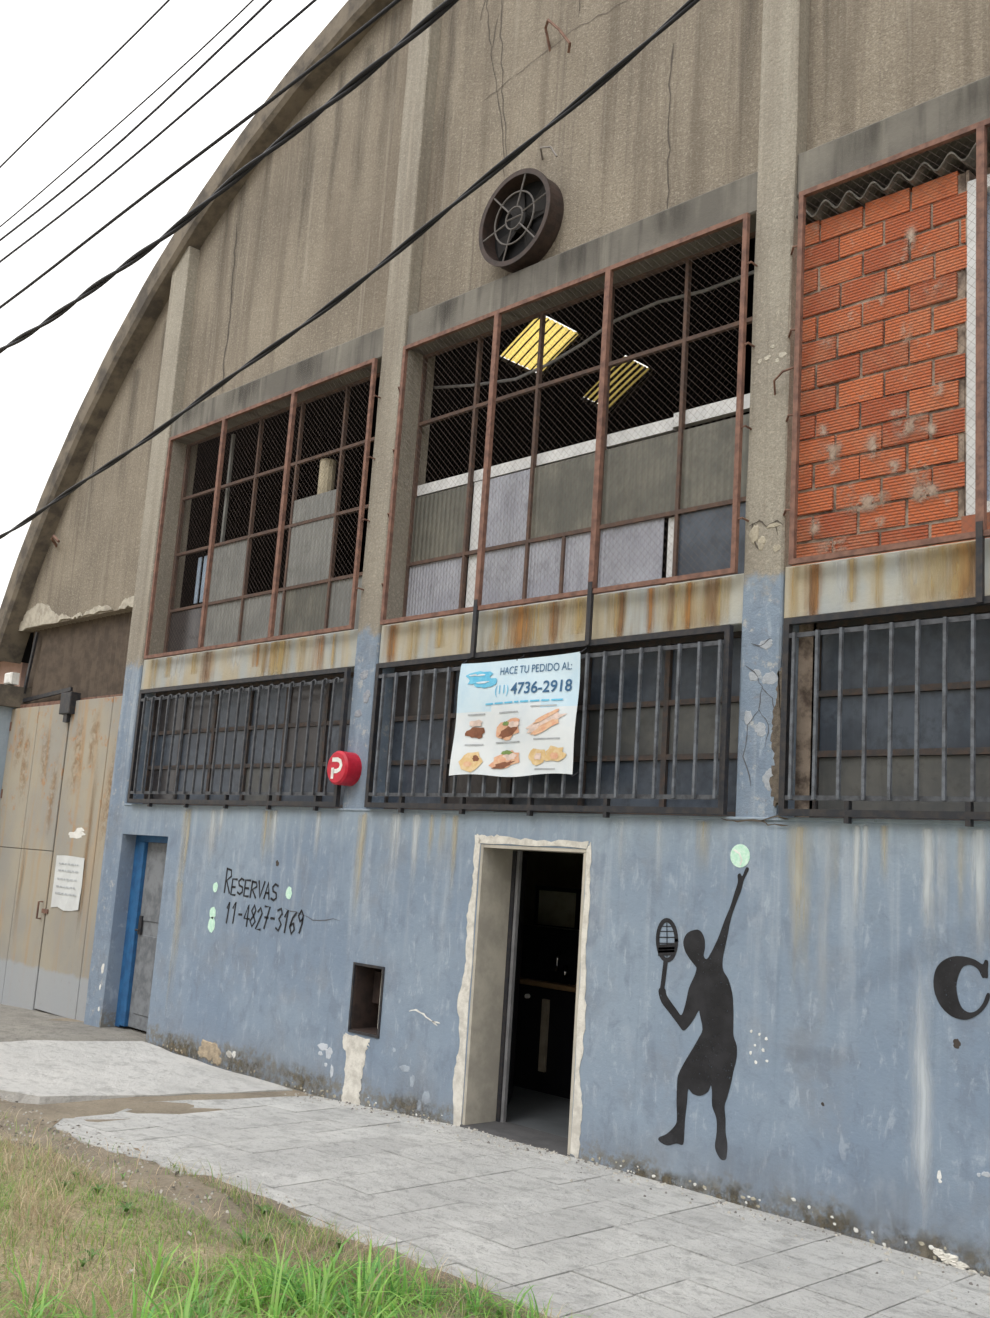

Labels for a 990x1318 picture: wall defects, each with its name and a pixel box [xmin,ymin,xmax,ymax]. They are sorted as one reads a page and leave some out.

crack [480,0,627,176]
spalling [749,522,781,552]
spalling [18,596,134,631]
corrosion [614,592,624,636]
corrosion [669,579,721,630]
corrosion [792,564,819,615]
spalling [744,667,782,807]
water stain [165,1038,199,1059]
peeling [282,834,989,1305]
water stain [632,1167,676,1185]
water stain [800,1209,854,1237]
water stain [894,1236,942,1262]